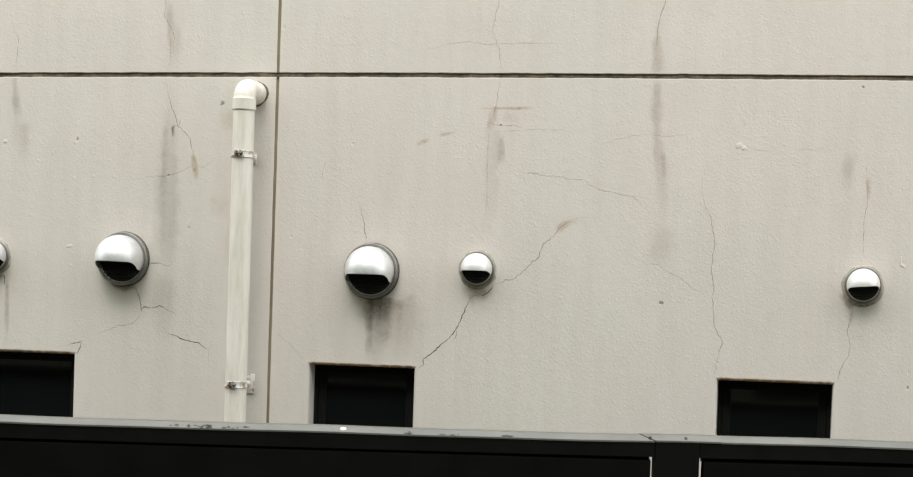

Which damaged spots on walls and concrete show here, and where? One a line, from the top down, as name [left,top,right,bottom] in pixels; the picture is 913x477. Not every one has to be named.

crack [134,89,211,180]
crack [68,287,209,362]
crack [418,217,598,369]
crack [625,170,723,375]